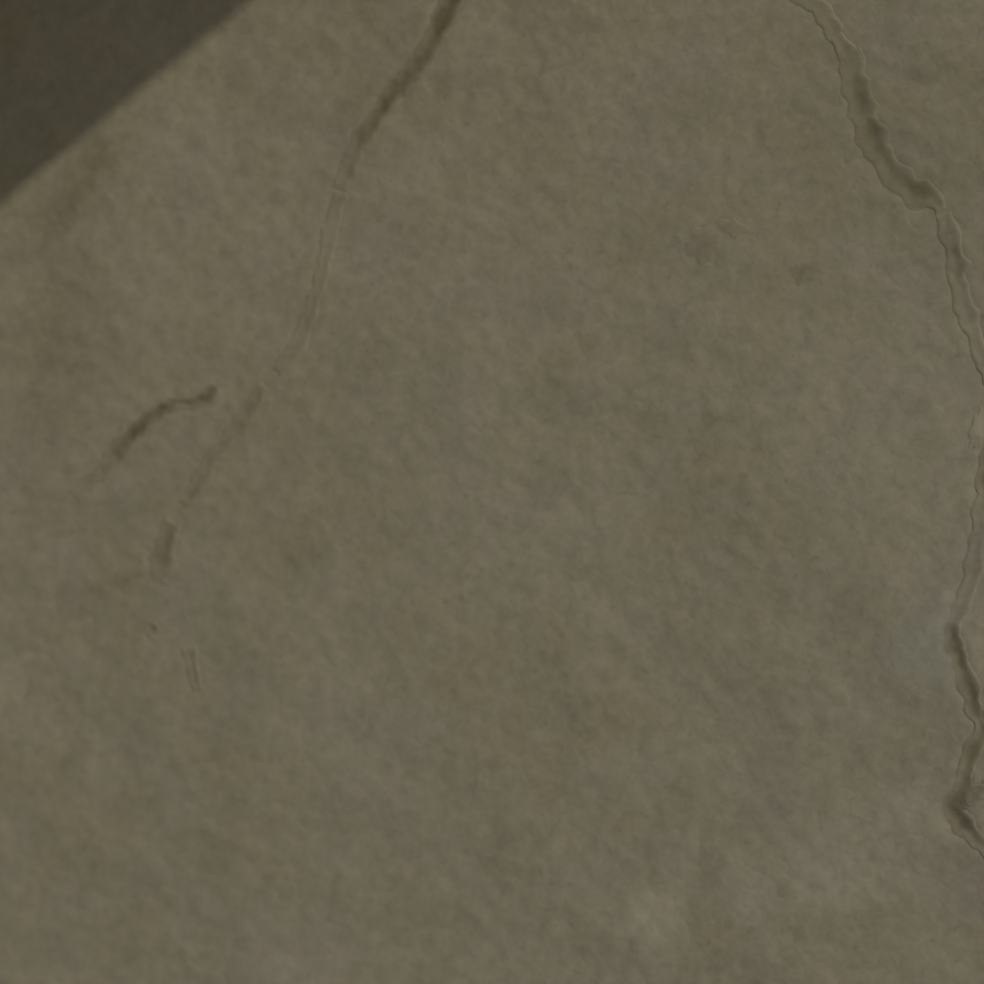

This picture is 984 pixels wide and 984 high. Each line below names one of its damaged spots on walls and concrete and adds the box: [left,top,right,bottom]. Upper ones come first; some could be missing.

crack [68,0,463,584]
crack [789,0,984,385]
crack [942,446,984,859]